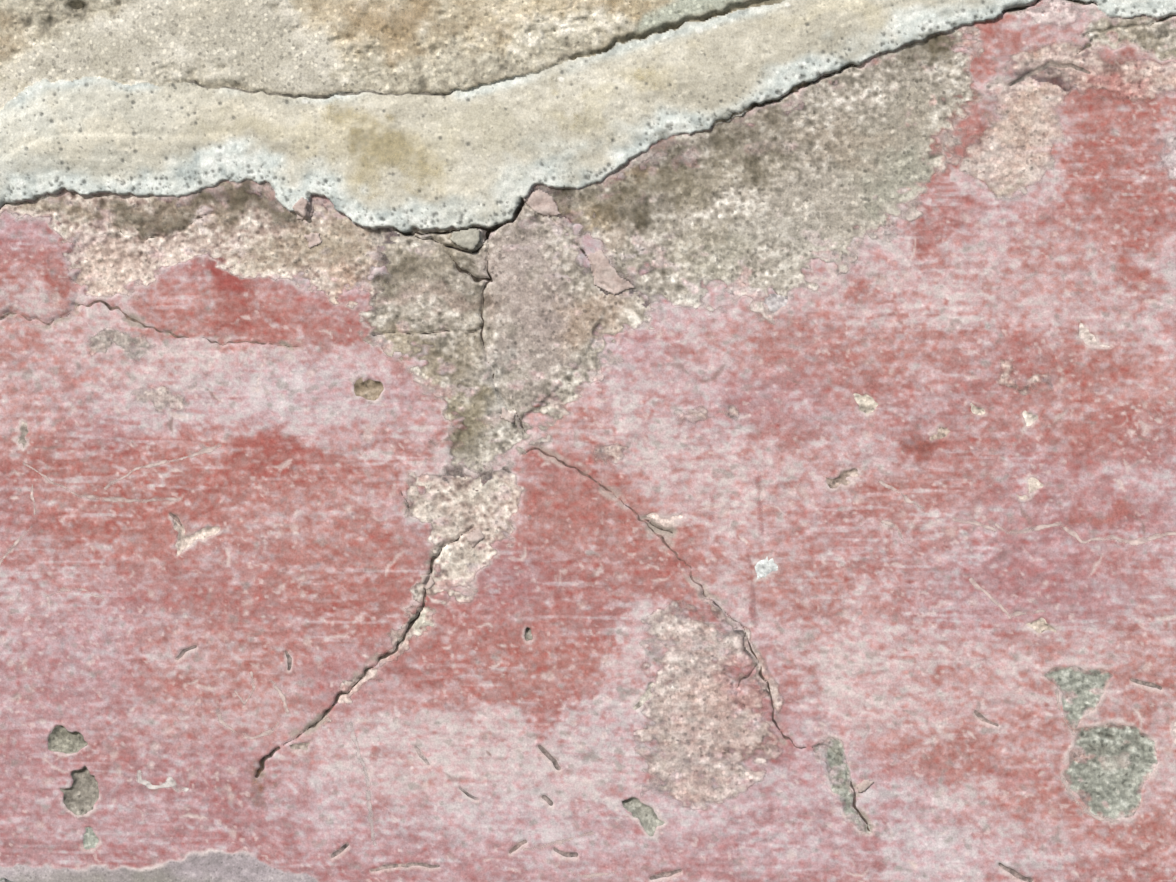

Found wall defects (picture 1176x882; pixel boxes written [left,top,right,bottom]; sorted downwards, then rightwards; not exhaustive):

crack [1002,0,1039,14]
crack [1067,0,1098,8]
crack [187,80,456,99]
crack [711,63,857,127]
spalling [0,0,1176,704]
crack [372,197,813,749]
crack [255,530,469,778]
peeling [48,725,88,754]
peeling [60,766,99,850]
spalling [622,593,784,836]
spalling [813,737,874,833]
spalling [1044,666,1158,821]